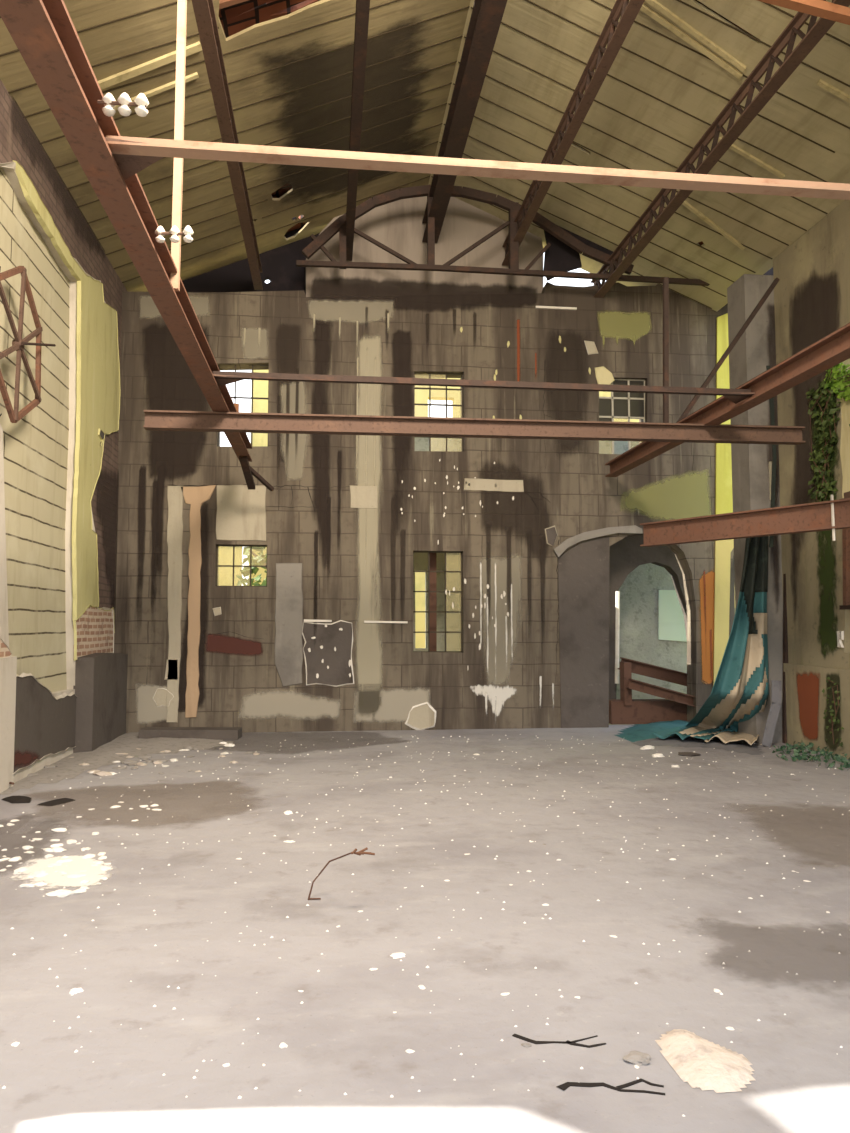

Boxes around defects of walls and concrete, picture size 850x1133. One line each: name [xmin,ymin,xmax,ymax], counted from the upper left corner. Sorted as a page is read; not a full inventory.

peeling [0,79,127,661]
damp [137,430,206,607]
damp [141,296,208,411]
damp [277,433,342,626]
damp [242,277,537,416]
damp [355,435,429,721]
damp [471,464,549,716]
peeling [840,394,850,498]